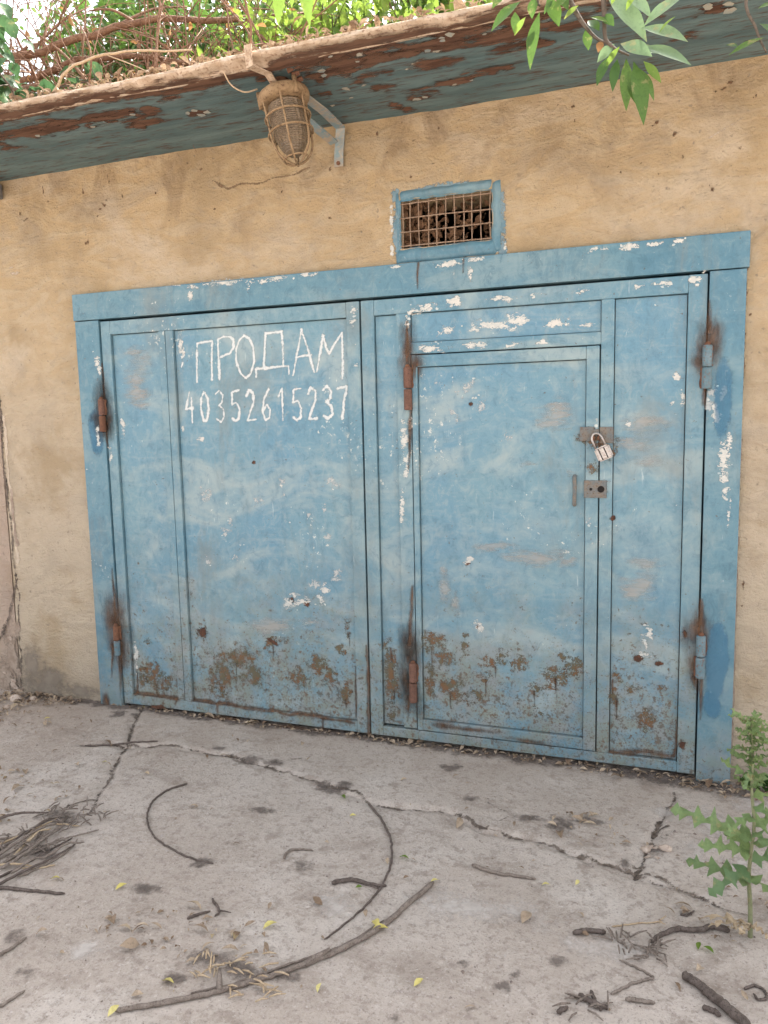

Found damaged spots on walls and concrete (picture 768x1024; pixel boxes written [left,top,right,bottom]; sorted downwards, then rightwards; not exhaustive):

peeling [0,0,611,151]
peeling [435,256,484,281]
peeling [589,237,686,252]
peeling [404,295,461,328]
peeling [419,295,529,353]
corrosion [694,301,719,368]
crack [0,398,23,685]
peeling [717,432,742,633]
corrosion [134,660,178,709]
corrosion [194,621,370,734]
corrosion [383,587,526,720]
corrosion [528,652,587,718]